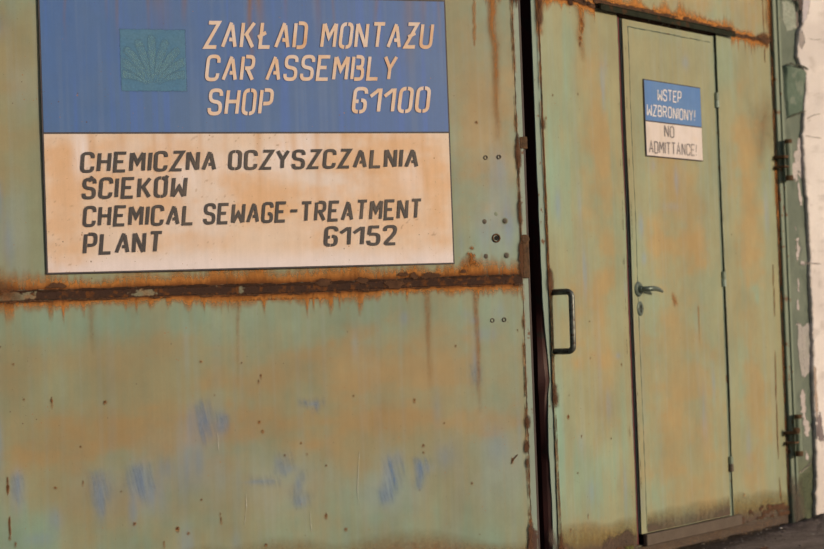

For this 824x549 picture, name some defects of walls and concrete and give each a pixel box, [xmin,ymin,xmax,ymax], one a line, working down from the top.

corrosion [488,0,498,103]
corrosion [537,0,772,50]
peeling [782,0,810,49]
corrosion [0,96,524,315]
corrosion [544,153,554,296]
peeling [792,138,802,206]
peeling [796,323,824,441]
corrosion [524,367,539,549]
corrosion [558,471,790,549]